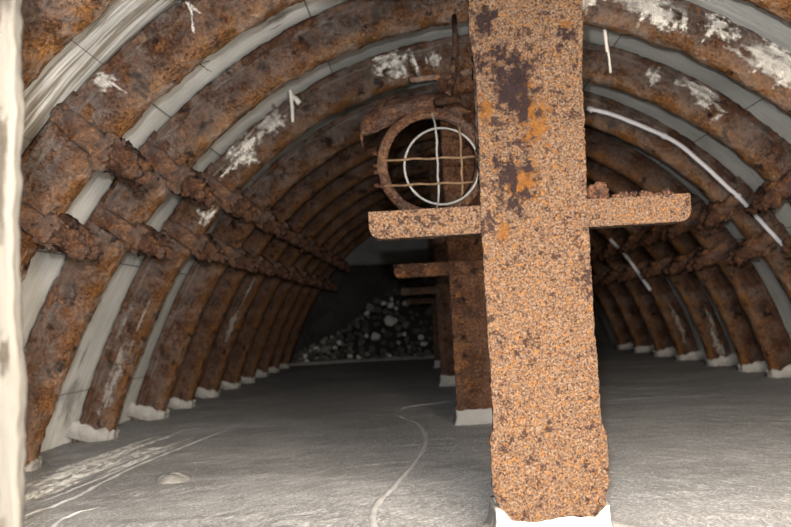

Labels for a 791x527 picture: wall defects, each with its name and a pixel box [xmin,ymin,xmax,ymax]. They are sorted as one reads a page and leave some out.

rust [476,2,498,35]
rust [556,19,578,46]
damp [616,0,688,30]
damp [702,14,742,42]
damp [94,73,120,91]
damp [373,53,441,79]
damp [738,38,791,88]
damp [674,81,722,119]
damp [222,114,284,177]
rust [475,39,553,219]